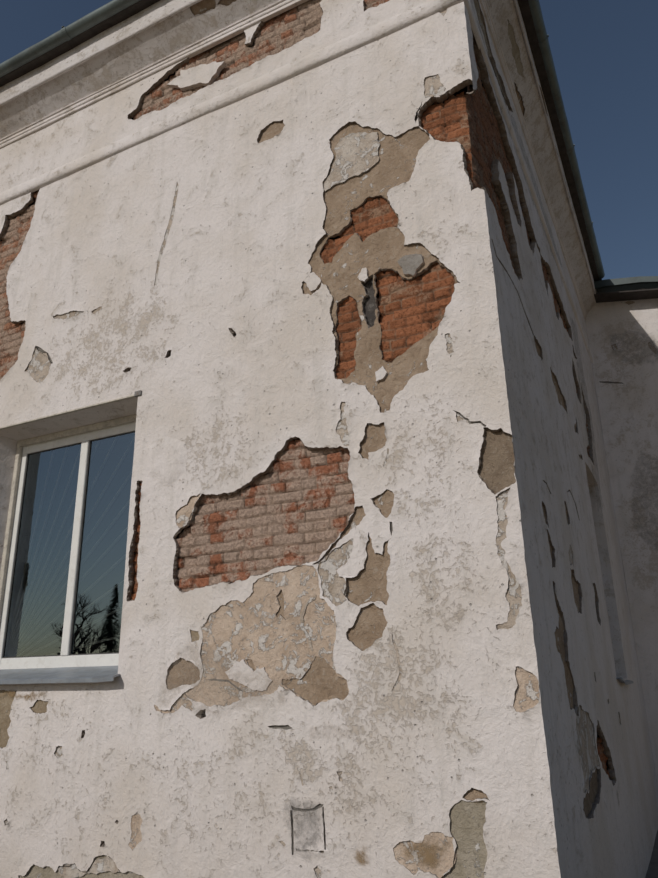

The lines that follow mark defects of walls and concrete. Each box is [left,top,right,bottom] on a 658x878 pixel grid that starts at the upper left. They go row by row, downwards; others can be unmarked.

flaking render [0,189,40,380]
crack [154,182,179,286]
crack [492,239,543,360]
peeling [25,346,52,383]
flaking render [126,0,594,719]
flaking render [0,690,16,748]
peeling [553,581,617,819]
flaking render [18,841,144,878]
flaking render [393,788,489,878]